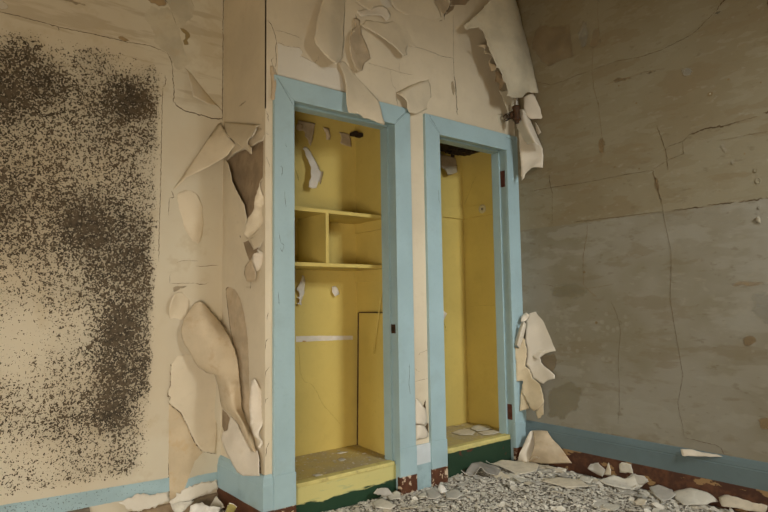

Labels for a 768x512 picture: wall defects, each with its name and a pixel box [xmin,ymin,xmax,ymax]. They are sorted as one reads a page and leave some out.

leakage [0,30,161,496]
peeling [174,122,265,282]
peeling [296,120,352,189]
peeling [270,0,385,125]
peeling [396,79,431,114]
peeling [440,154,457,175]
peeling [435,0,469,15]
peeling [464,0,543,180]
crack [534,111,768,256]
peeling [119,287,263,512]
peeling [515,312,556,418]